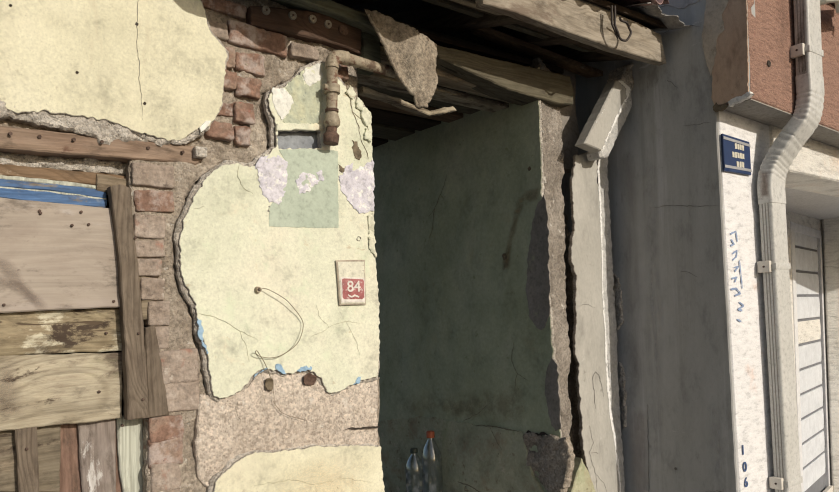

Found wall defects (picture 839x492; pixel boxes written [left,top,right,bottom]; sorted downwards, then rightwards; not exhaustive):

peeling [702,0,754,112]
flaking render [0,0,380,492]
peeling [525,194,551,330]
crack [563,212,606,488]
flaking render [523,357,575,492]